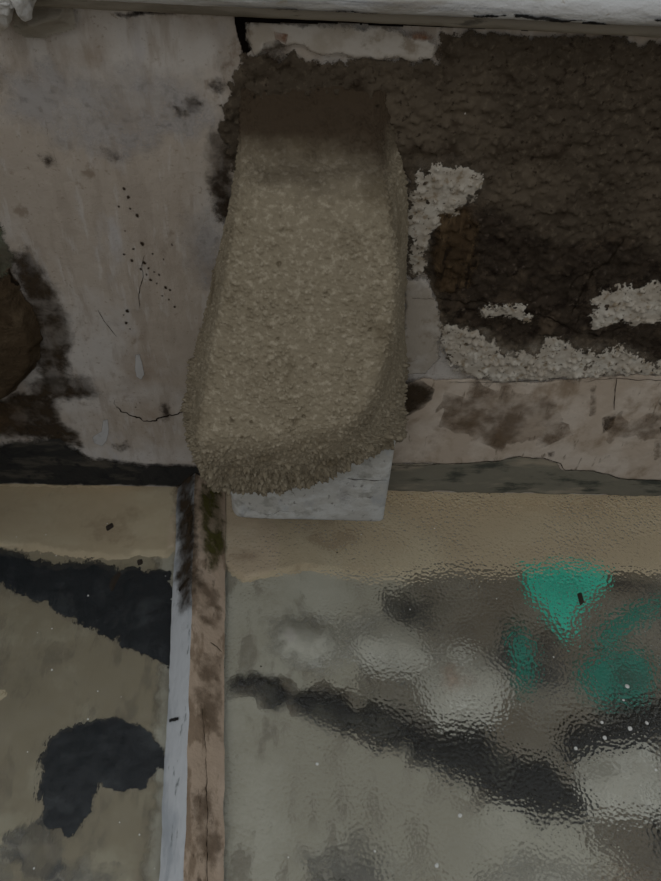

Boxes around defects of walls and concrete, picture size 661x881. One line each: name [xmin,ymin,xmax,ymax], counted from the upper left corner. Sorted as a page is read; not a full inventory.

peeling [407,162,484,278]
peeling [0,228,14,278]
peeling [480,302,534,323]
peeling [588,280,661,330]
water stain [0,254,93,447]
peeling [438,323,661,383]
crack [114,400,182,422]
water stain [404,381,433,415]
water stain [444,389,522,448]